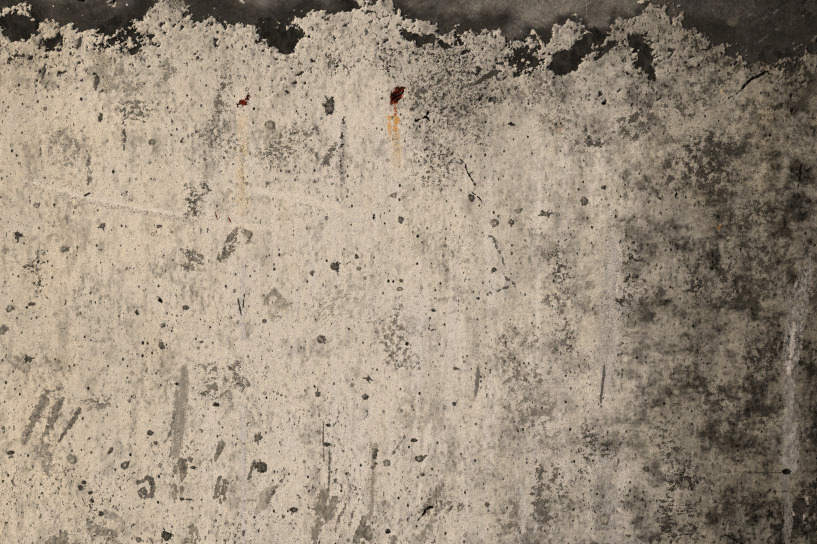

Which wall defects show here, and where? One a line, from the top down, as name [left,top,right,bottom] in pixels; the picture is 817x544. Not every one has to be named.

peeling [0,9,65,58]
peeling [94,0,154,55]
peeling [255,16,311,55]
peeling [339,0,365,12]
peeling [398,25,462,49]
peeling [499,26,659,80]
peeling [758,43,805,80]
rust [228,92,251,222]
rust [386,86,407,179]
water stain [371,32,817,544]
water stain [367,443,379,520]